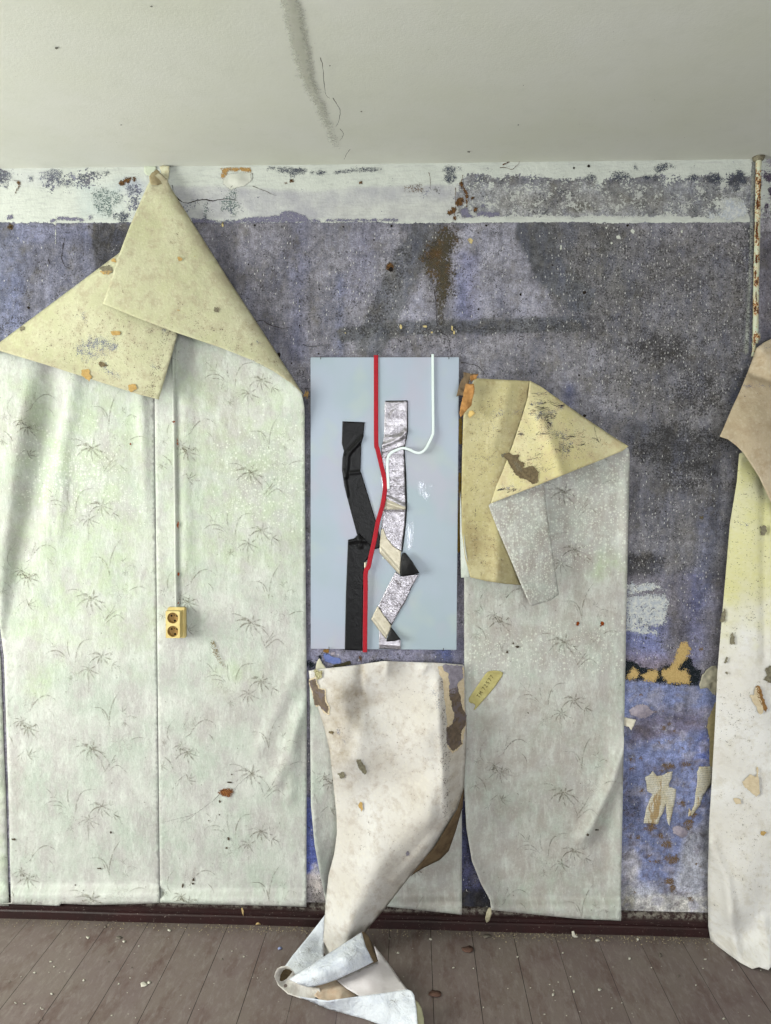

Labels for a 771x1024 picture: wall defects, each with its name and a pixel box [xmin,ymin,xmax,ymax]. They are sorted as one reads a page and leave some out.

peeling [0,169,109,194]
flaking render [113,176,137,223]
flaking render [220,167,251,179]
flaking render [442,165,505,220]
peeling [609,163,674,181]
peeling [688,169,747,191]
peeling [191,210,398,227]
peeling [307,649,391,669]
peeling [625,641,703,696]
peeling [707,702,716,767]